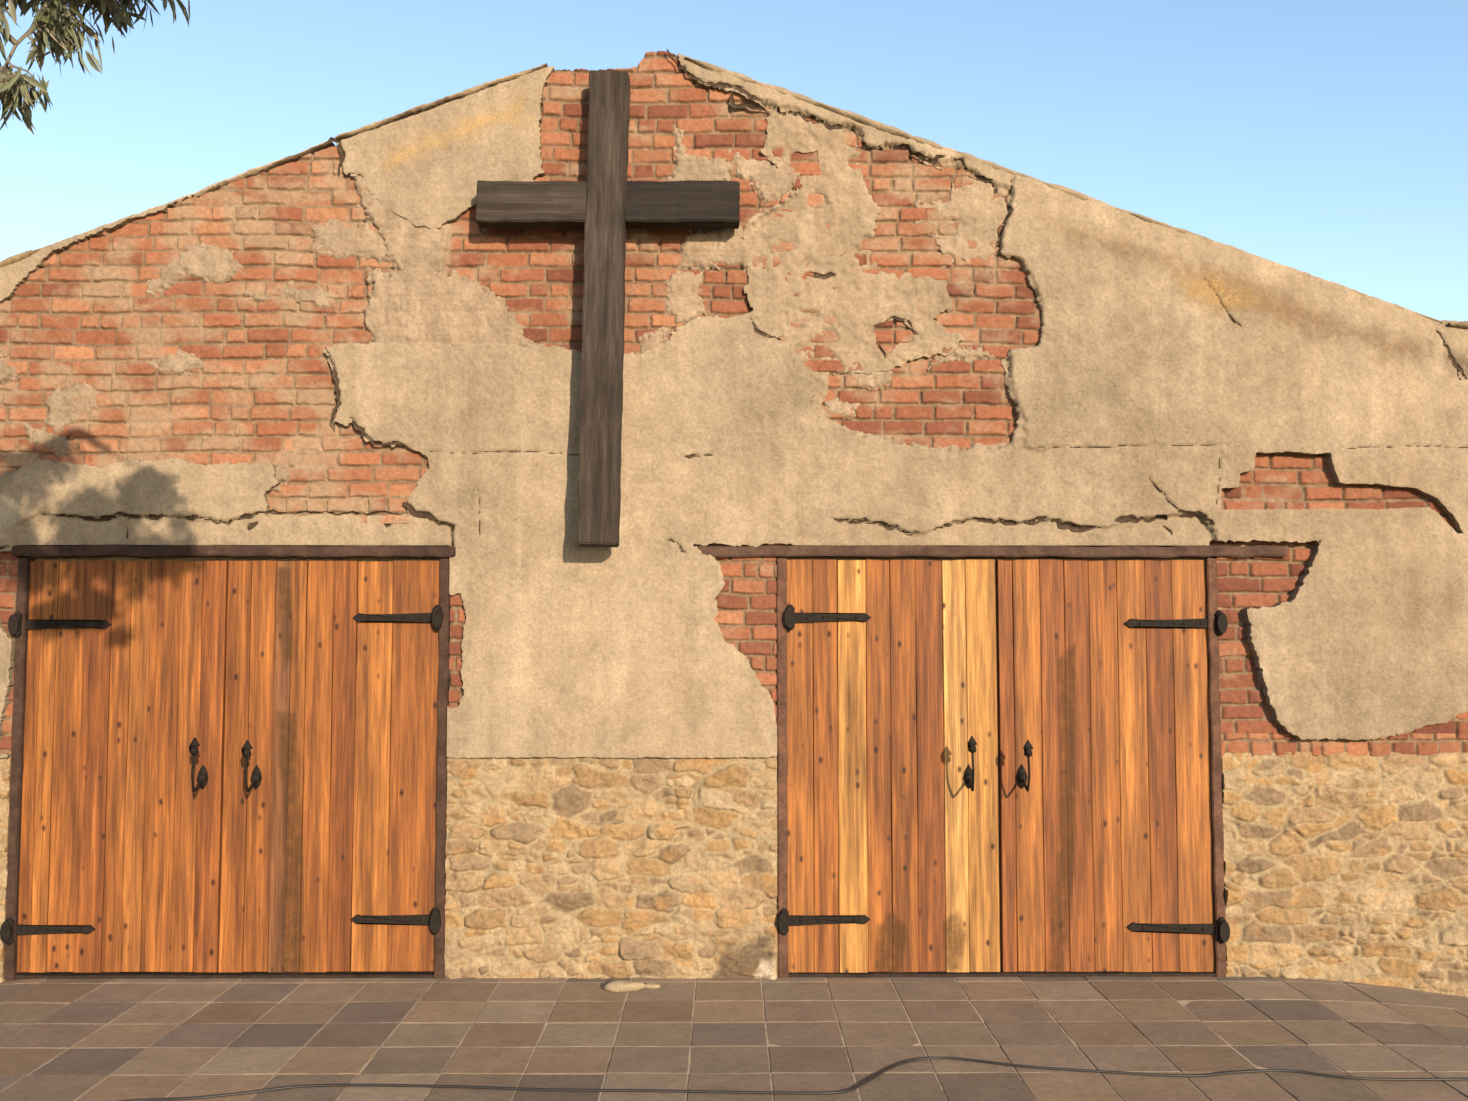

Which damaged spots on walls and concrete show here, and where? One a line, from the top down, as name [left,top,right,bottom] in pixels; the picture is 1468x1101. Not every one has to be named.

spalling [534,51,1042,450]
spalling [0,146,585,530]
crack [1436,330,1467,381]
crack [41,498,480,546]
crack [832,444,1221,536]
spalling [1221,453,1455,530]
spalling [0,552,26,639]
spalling [693,543,793,725]
spalling [1209,540,1468,756]
spalling [0,668,14,753]